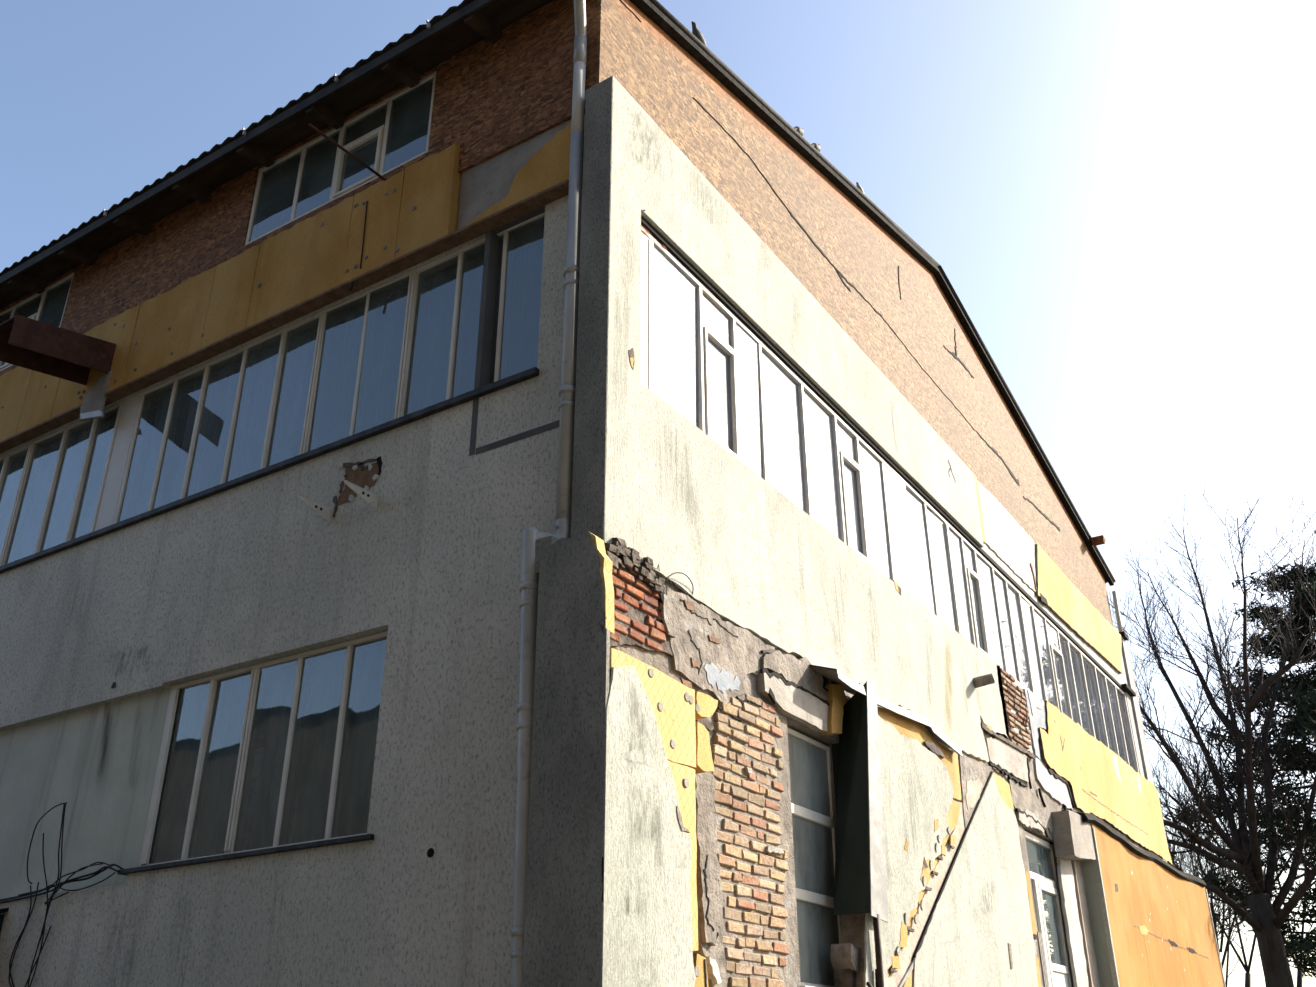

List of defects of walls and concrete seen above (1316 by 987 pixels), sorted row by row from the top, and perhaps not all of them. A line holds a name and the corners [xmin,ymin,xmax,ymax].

crack [693,97,1060,531]
flaking render [604,537,837,987]
spalling [904,668,1075,932]
spalling [1057,858,1089,987]